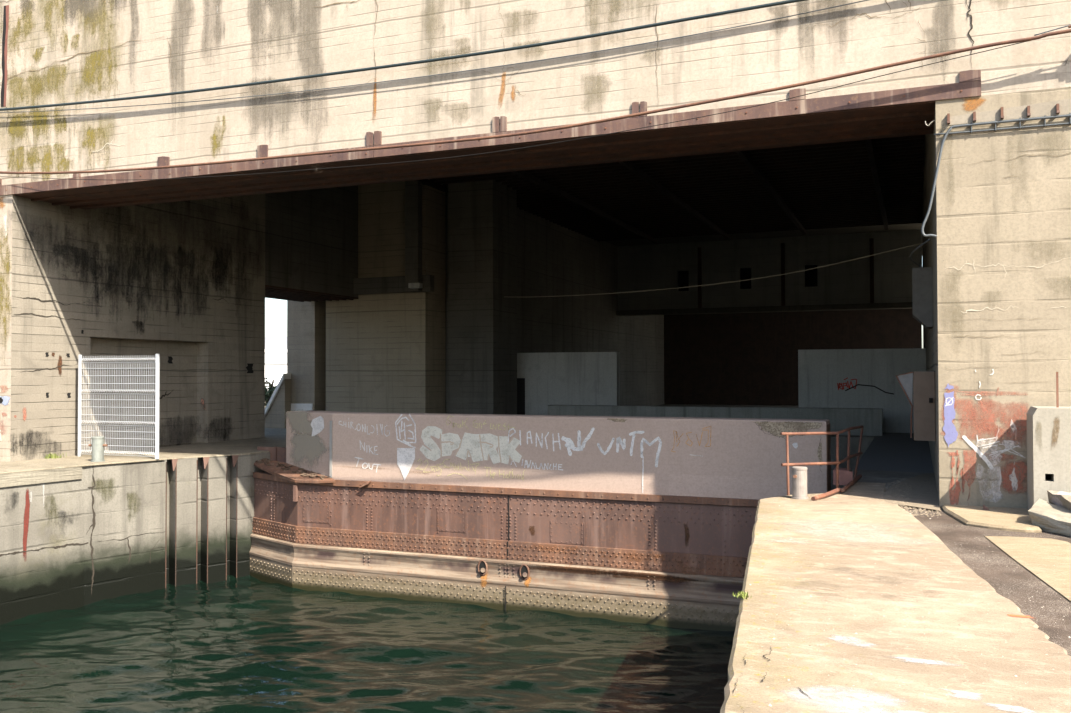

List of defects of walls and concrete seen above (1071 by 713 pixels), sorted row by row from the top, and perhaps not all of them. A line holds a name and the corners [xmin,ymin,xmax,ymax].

water stain [8,47,70,180]
water stain [11,0,116,93]
water stain [83,118,112,156]
water stain [171,0,191,86]
water stain [250,0,322,98]
rust [499,73,515,101]
water stain [775,0,854,39]
crack [966,0,977,67]
water stain [29,213,259,332]
peeling [943,384,1028,505]
crack [0,469,163,595]
rust [524,559,698,587]